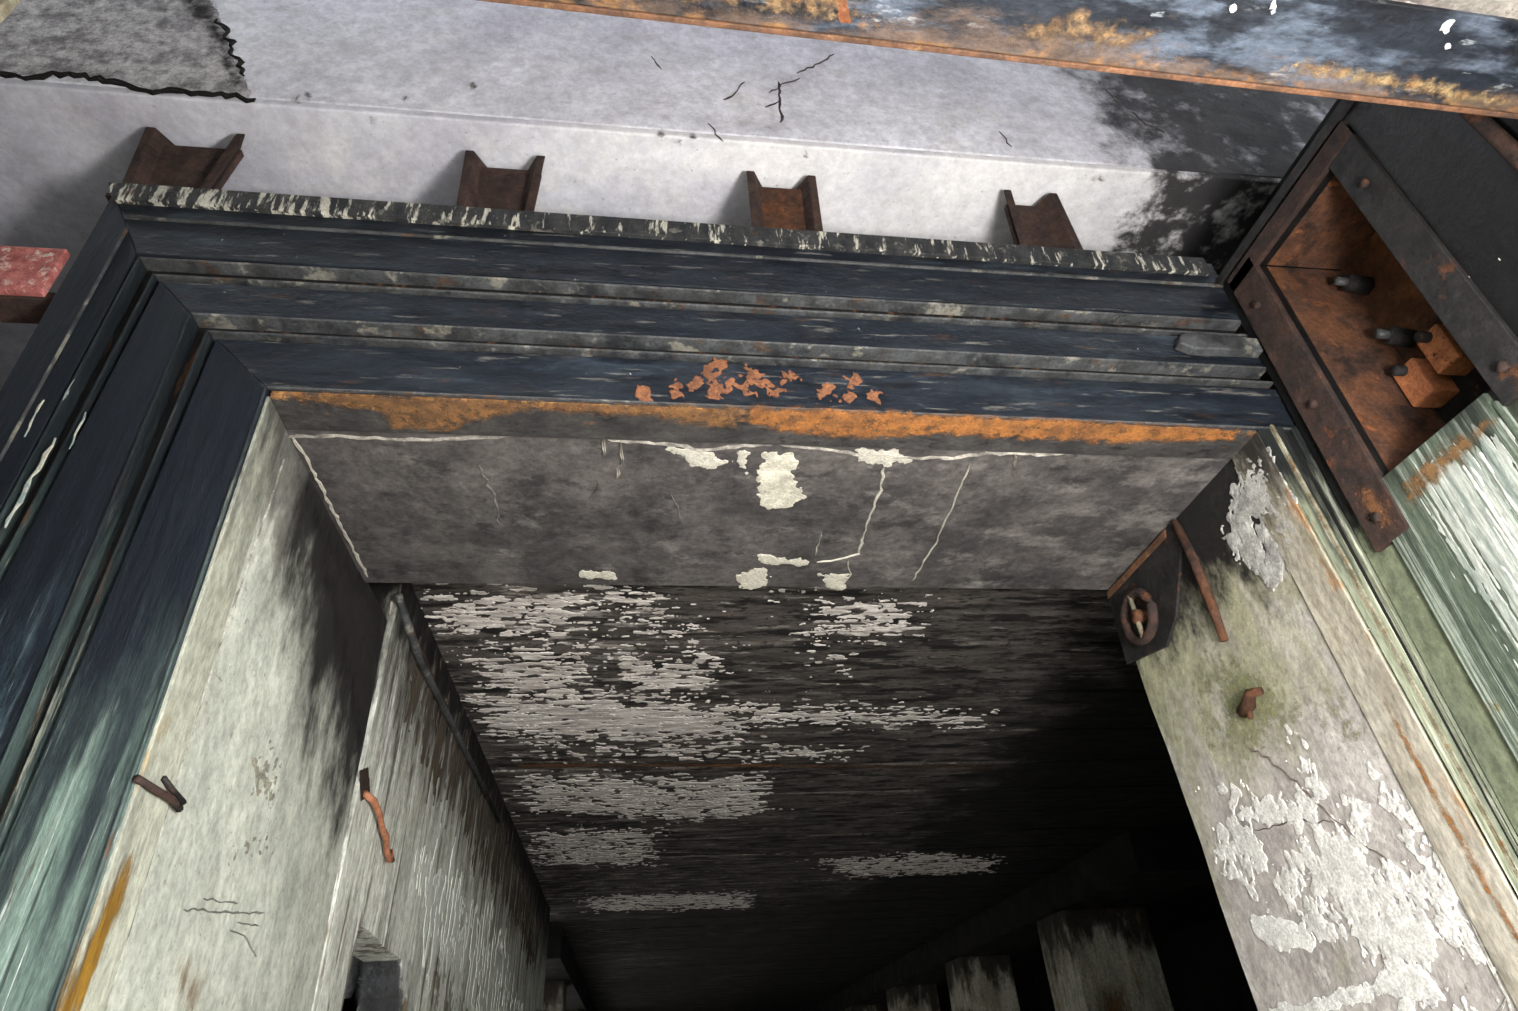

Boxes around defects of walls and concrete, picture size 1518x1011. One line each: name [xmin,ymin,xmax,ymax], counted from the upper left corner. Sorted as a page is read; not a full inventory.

spalling [0,0,251,98]
corrosion [766,0,852,24]
crack [708,54,834,141]
corrosion [300,357,1239,444]
peeling [665,446,807,510]
peeling [855,448,913,467]
peeling [1220,447,1298,592]
peeling [402,554,1008,1011]
peeling [1195,724,1497,1011]